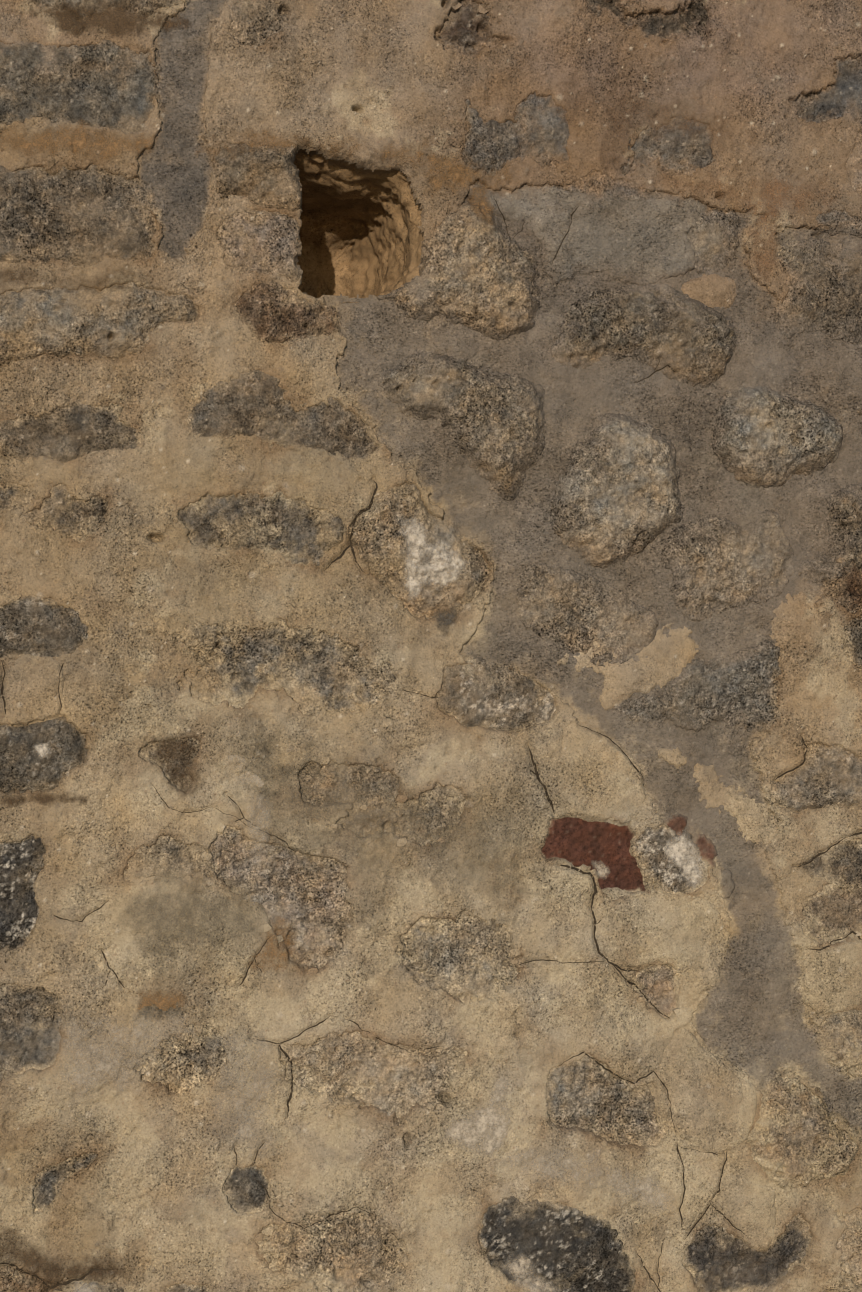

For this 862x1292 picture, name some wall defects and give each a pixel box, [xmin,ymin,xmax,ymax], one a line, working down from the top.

spalling [830,553,862,614]
spalling [297,757,467,847]
crack [528,746,555,814]
crack [580,725,644,785]
crack [798,832,862,867]
crack [239,936,272,986]
spalling [396,910,521,1003]
crack [519,865,669,1018]
spalling [631,959,683,1018]
crack [806,924,861,951]
spalling [278,1030,467,1126]
crack [561,1051,744,1292]